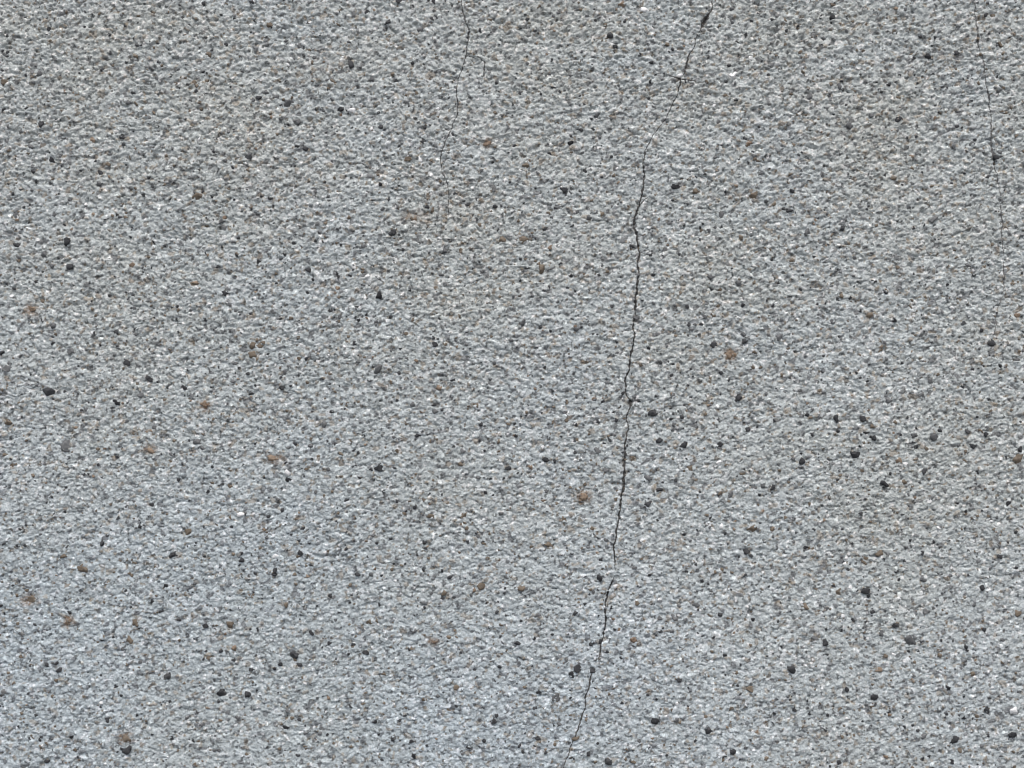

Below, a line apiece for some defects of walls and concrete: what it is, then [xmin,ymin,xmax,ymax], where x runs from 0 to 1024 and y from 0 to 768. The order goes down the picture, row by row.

crack [563,0,713,768]